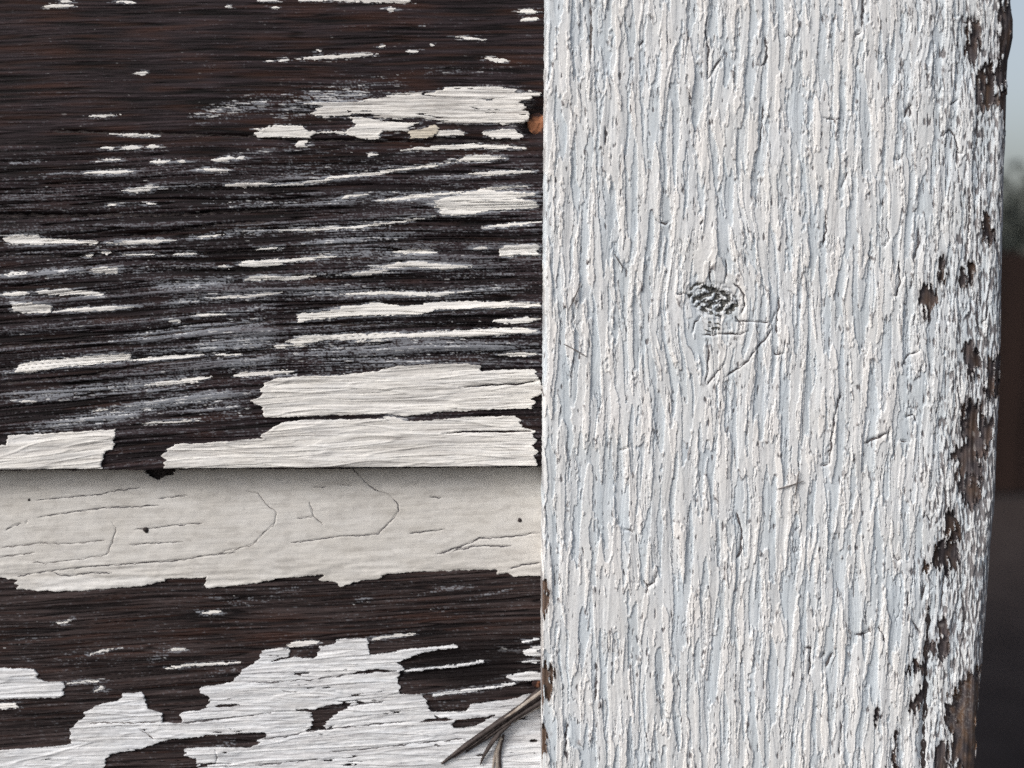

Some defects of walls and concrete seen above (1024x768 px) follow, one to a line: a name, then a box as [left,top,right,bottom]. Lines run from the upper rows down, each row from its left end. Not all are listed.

peeling [964,0,1013,137]
peeling [84,133,185,174]
peeling [204,87,542,231]
peeling [2,289,134,314]
peeling [3,234,197,274]
peeling [211,247,340,299]
peeling [274,291,541,349]
peeling [918,254,976,322]
peeling [922,339,1000,578]
crack [0,469,539,578]
peeling [0,633,556,768]
peeling [934,664,982,768]